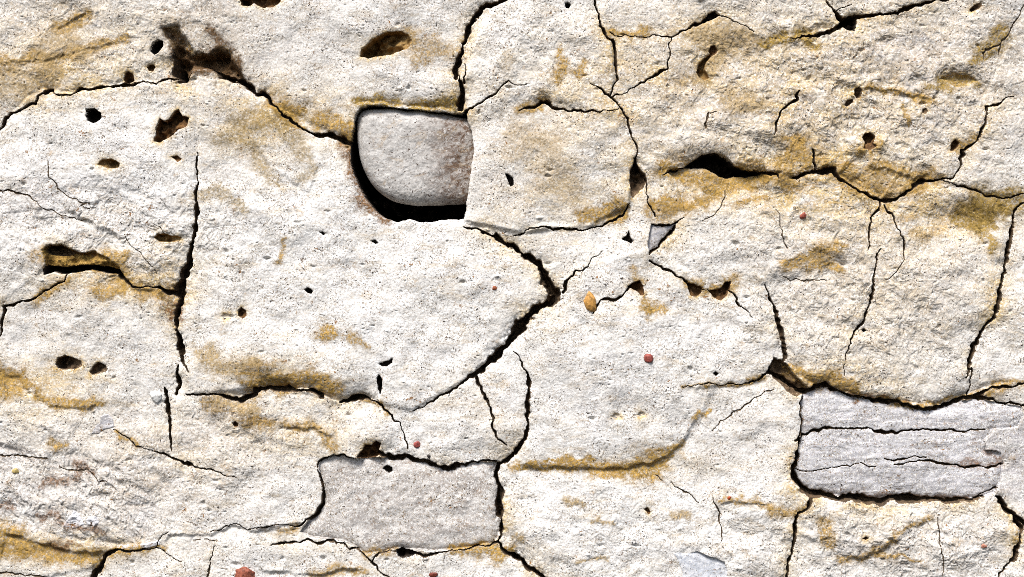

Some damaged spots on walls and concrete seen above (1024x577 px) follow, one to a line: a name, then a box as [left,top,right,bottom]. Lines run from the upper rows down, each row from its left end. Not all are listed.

crack [790,0,949,39]
crack [982,5,1024,60]
crack [0,52,355,148]
crack [0,161,96,221]
spalling [351,106,471,222]
crack [0,274,68,337]
crack [113,0,754,577]
crack [682,90,1024,577]
crack [0,454,107,483]
crack [0,569,47,577]
crack [90,532,182,577]